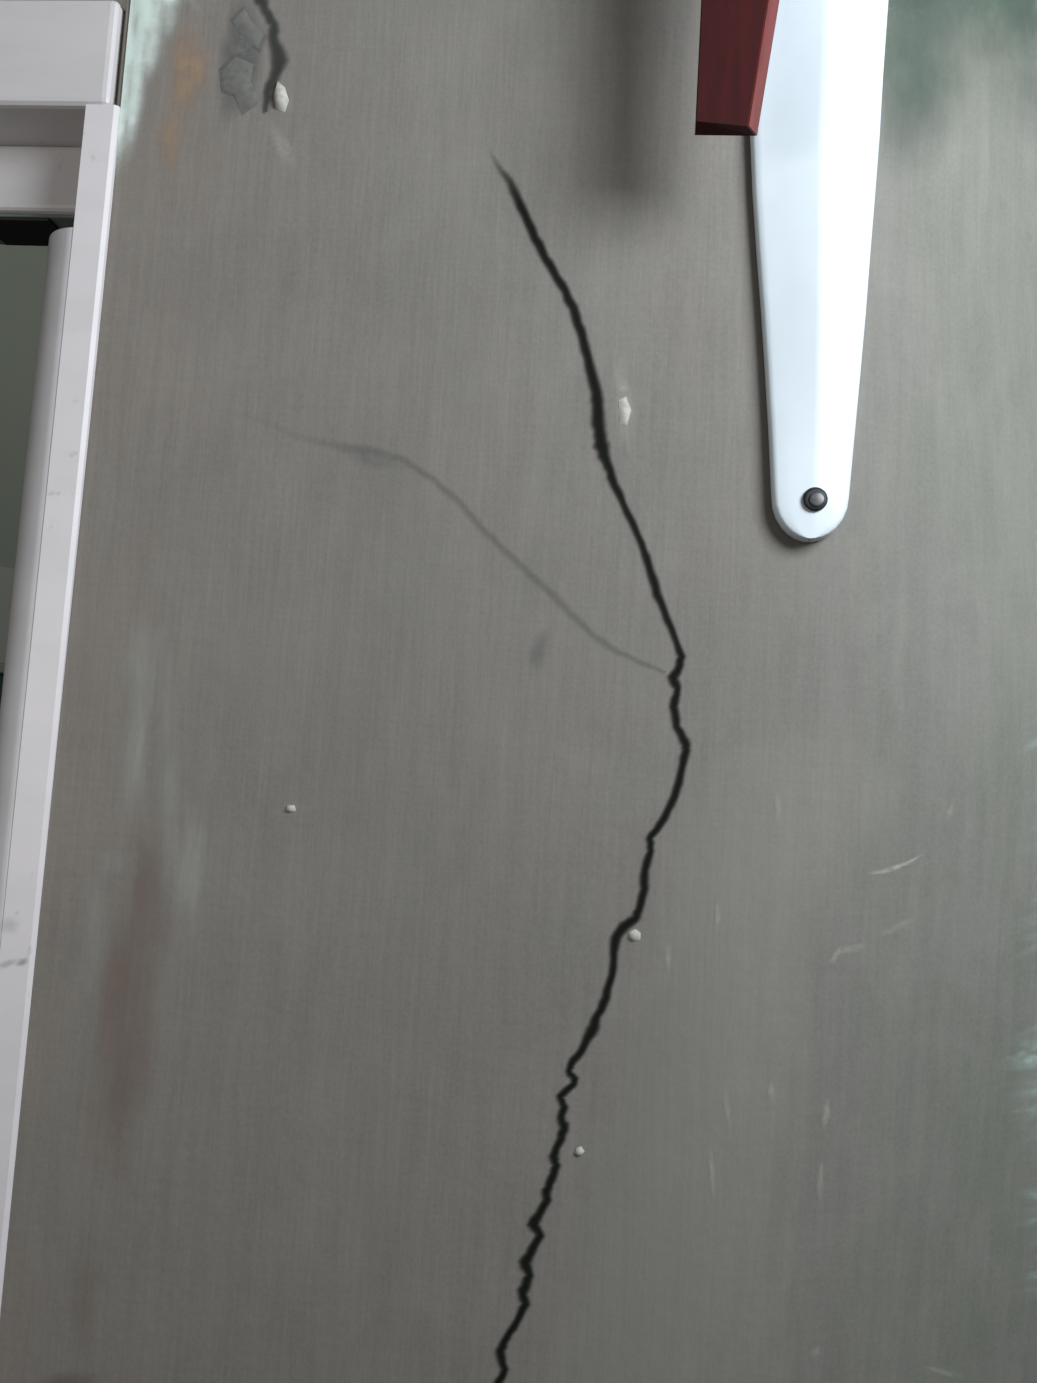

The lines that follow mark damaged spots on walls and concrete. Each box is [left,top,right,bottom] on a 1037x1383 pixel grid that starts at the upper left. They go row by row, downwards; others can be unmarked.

flaking render [219,0,289,115]
crack [495,174,690,1383]